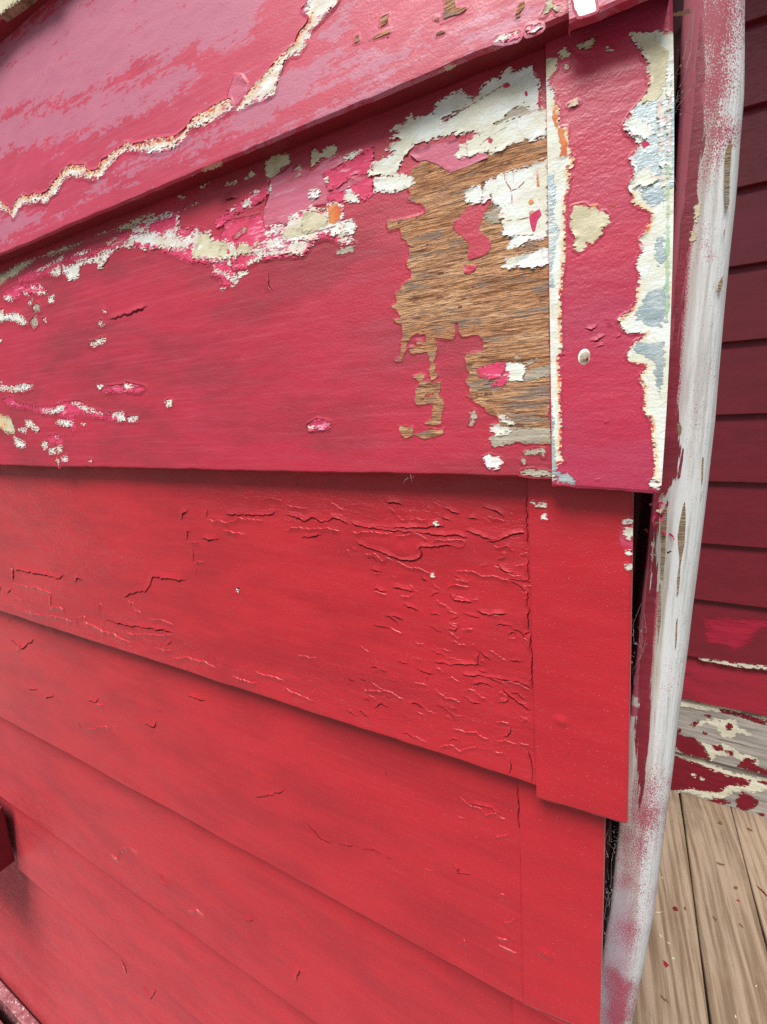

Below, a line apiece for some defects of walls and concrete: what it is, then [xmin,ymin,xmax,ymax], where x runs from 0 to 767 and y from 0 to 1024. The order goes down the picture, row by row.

peeling [0,0,706,808]
crack [0,496,534,842]
peeling [670,699,767,816]